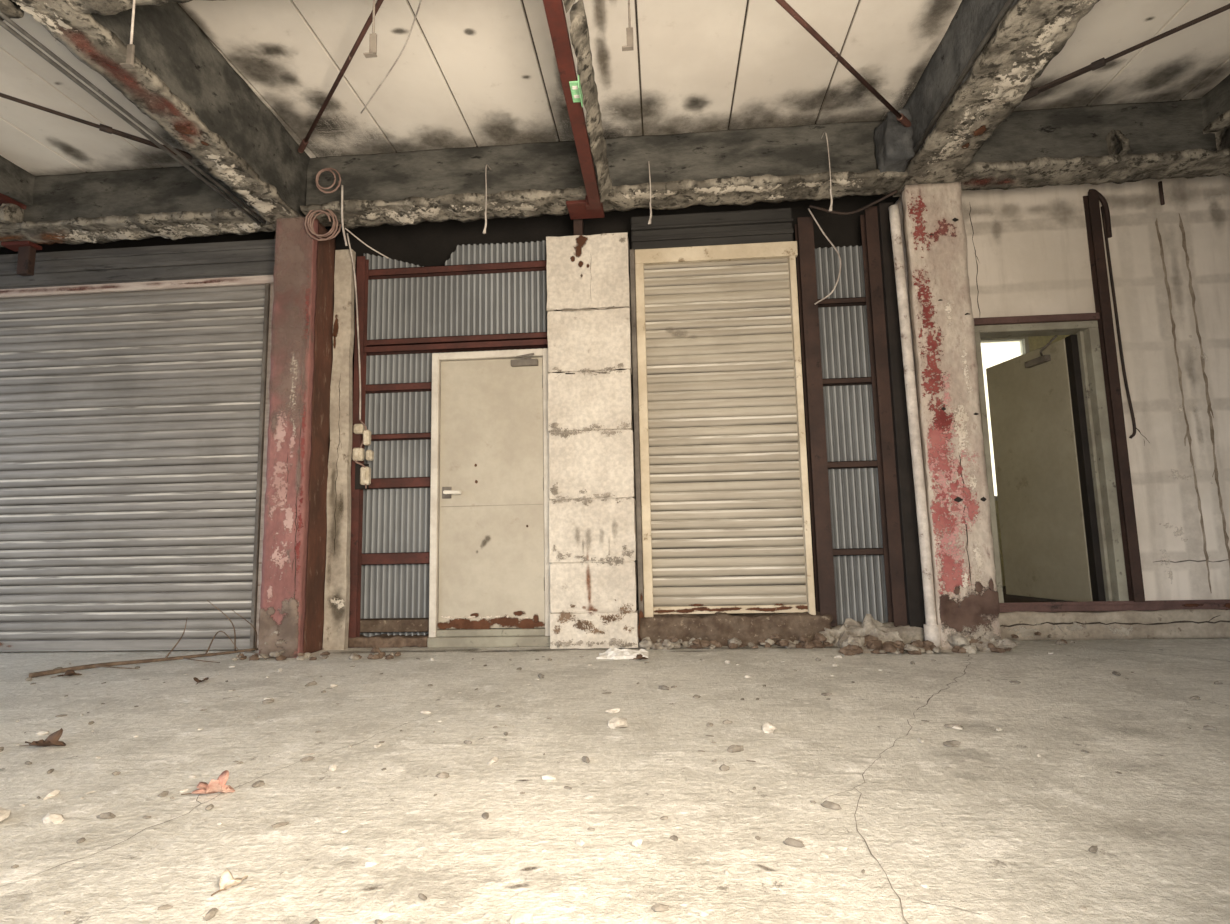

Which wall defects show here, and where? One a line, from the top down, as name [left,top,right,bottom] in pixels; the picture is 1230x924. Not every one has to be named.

spalling [14,0,77,44]
damp [924,0,955,27]
damp [228,47,296,84]
damp [598,44,608,74]
spalling [924,0,1096,179]
damp [1013,64,1224,112]
damp [324,78,888,157]
peeling [55,150,312,658]
peeling [907,193,1087,643]
corrosion [437,611,545,630]
corrosion [638,594,808,641]
crack [826,654,1004,924]